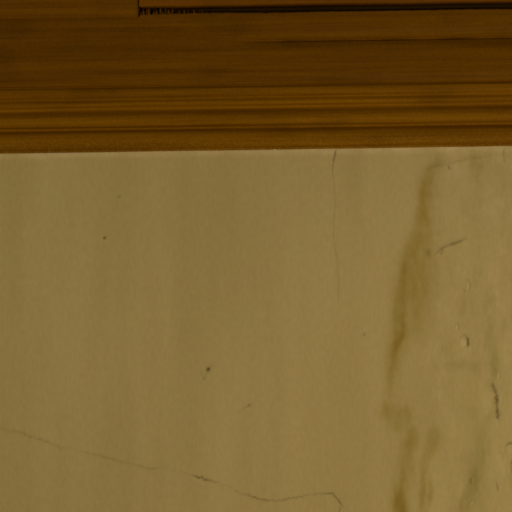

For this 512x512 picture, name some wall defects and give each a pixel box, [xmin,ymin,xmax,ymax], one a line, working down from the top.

water stain [370,153,452,512]
crack [487,370,504,422]